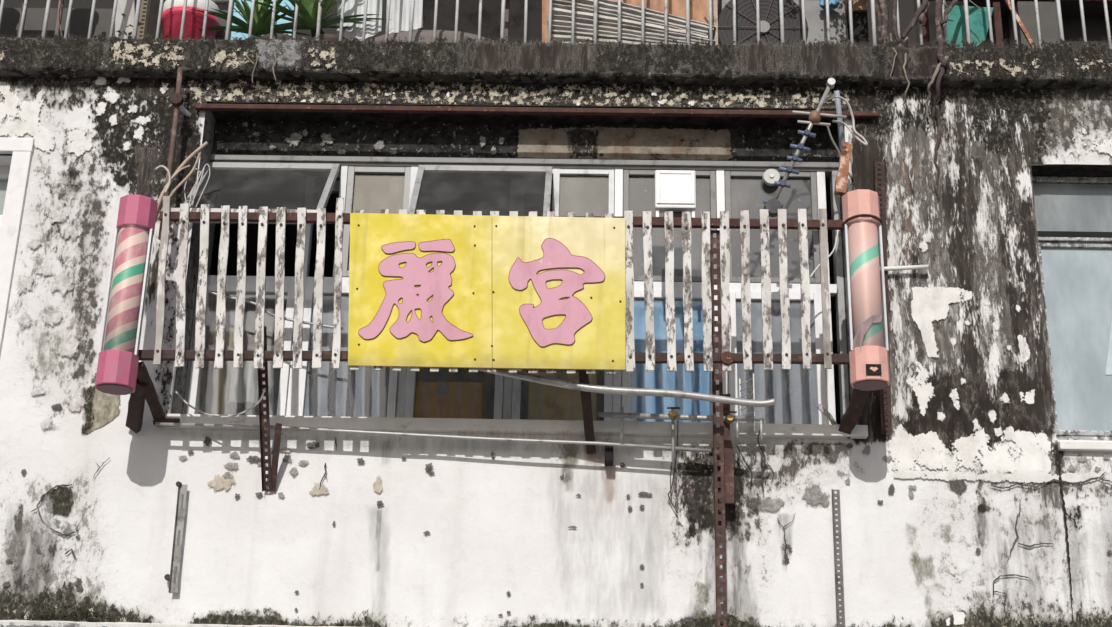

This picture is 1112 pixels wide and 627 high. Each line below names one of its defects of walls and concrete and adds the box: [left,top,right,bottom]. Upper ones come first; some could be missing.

peeling [209,48,253,68]
peeling [308,47,336,69]
water stain [0,33,1112,81]
peeling [0,82,95,156]
peeling [95,77,151,150]
peeling [881,94,960,196]
water stain [0,77,1112,547]
peeling [878,184,1112,529]
spalling [40,486,80,539]
crack [990,444,1112,619]
water stain [0,533,162,623]
water stain [929,593,1112,627]